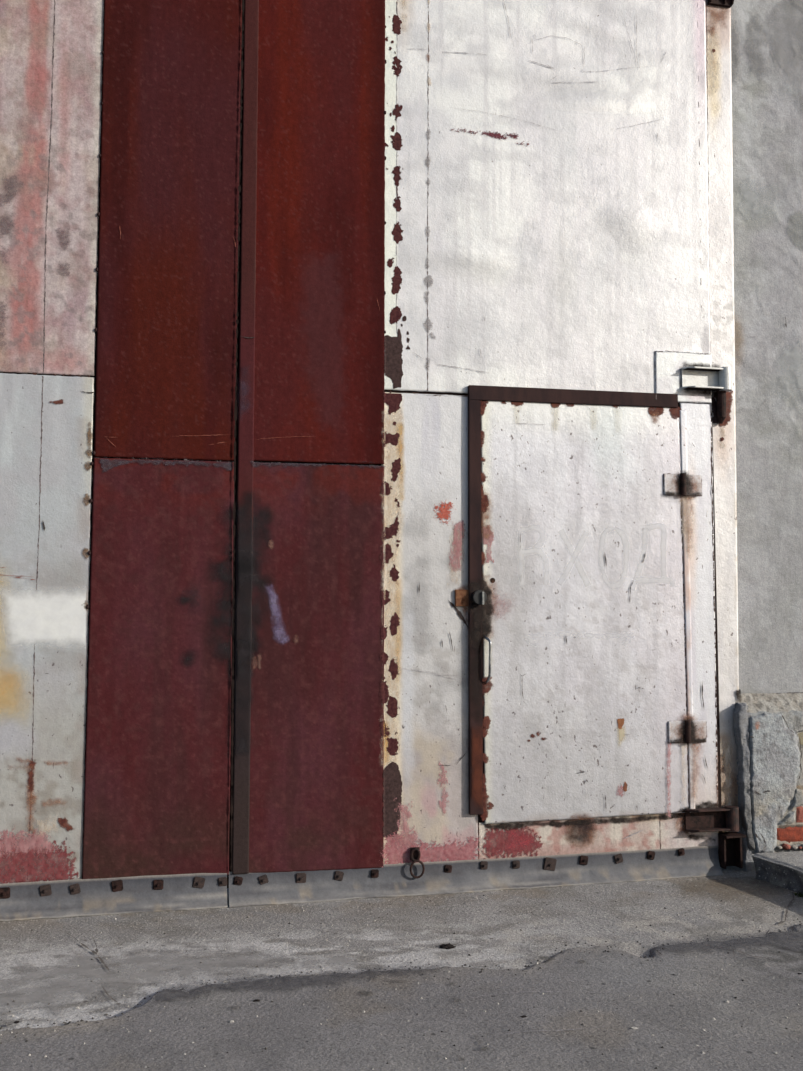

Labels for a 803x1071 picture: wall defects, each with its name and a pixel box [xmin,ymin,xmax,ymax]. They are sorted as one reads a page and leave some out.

peeling [385,7,402,78]
peeling [385,103,403,150]
peeling [451,128,530,147]
peeling [386,166,404,244]
rust [648,407,682,422]
rust [481,431,491,538]
rust [666,472,701,534]
peeling [251,258,543,867]
rust [460,578,494,705]
rust [471,715,731,840]
crack [764,692,803,785]
spalling [776,806,803,850]